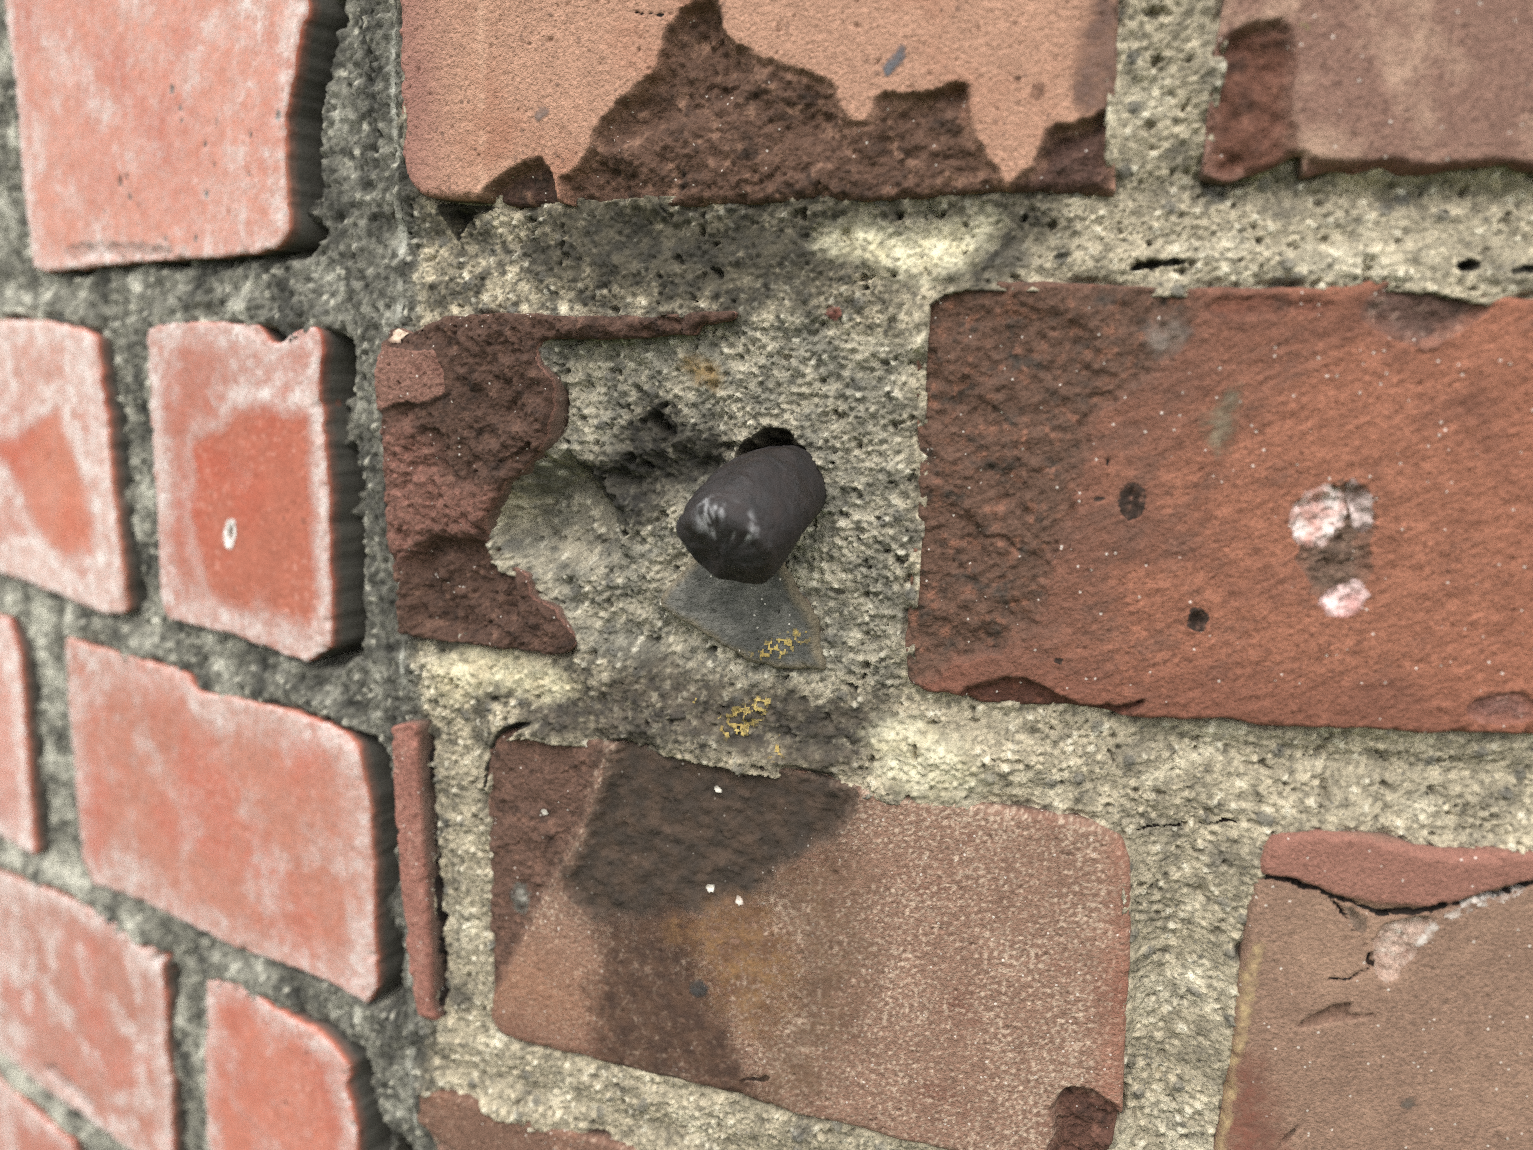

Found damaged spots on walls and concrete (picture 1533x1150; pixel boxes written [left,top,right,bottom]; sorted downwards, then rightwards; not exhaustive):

spalling [477,0,1115,208]
spalling [379,311,735,655]
crack [1265,874,1533,981]
spalling [1045,1086,1123,1150]